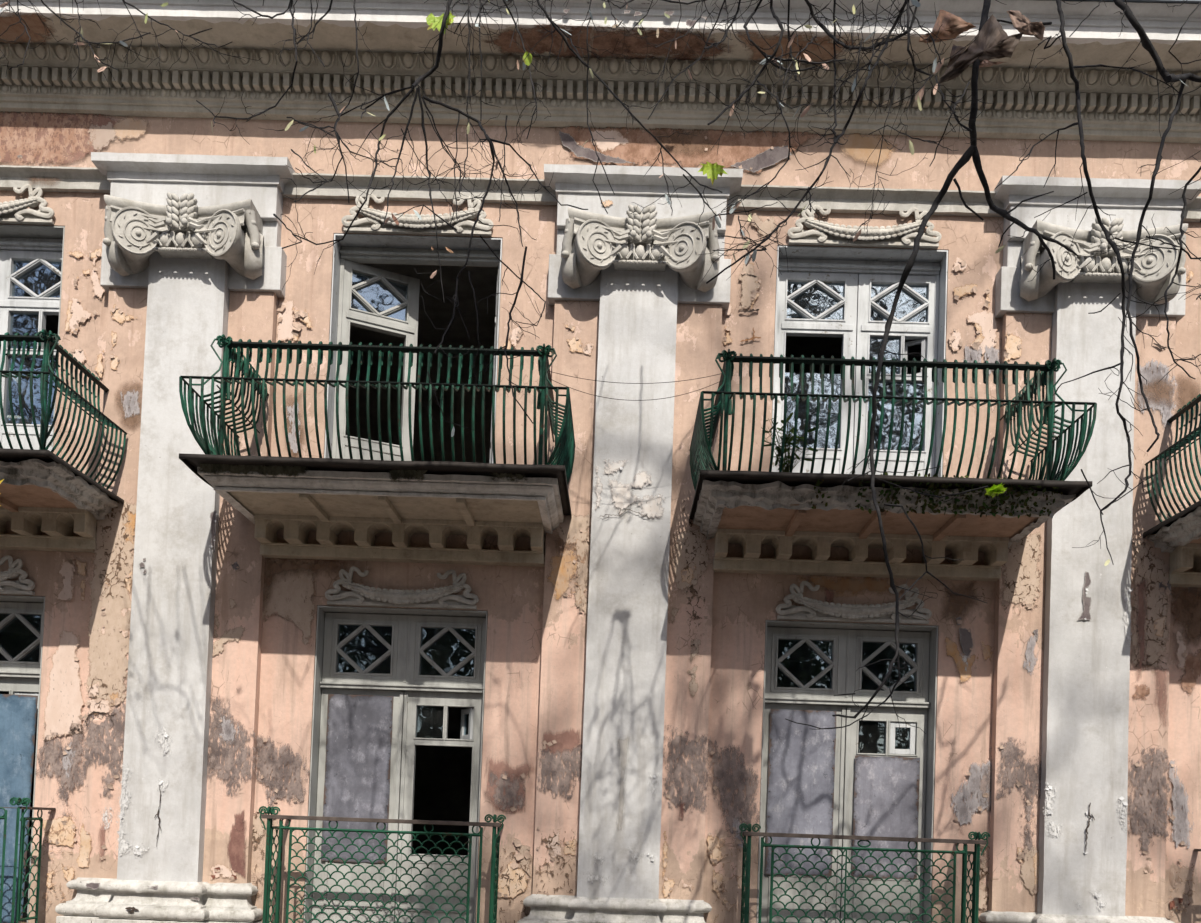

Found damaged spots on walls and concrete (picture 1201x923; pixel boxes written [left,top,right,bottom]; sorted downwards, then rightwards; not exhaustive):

spalling [0,111,149,166]
peeling [65,248,137,378]
peeling [594,458,665,519]
spalling [1078,572,1091,621]
peeling [34,500,149,915]
spalling [207,695,309,900]
spalling [487,729,583,812]
spalling [649,725,759,920]
peeling [970,844,990,923]
spalling [951,737,1063,895]
spalling [1117,747,1195,918]